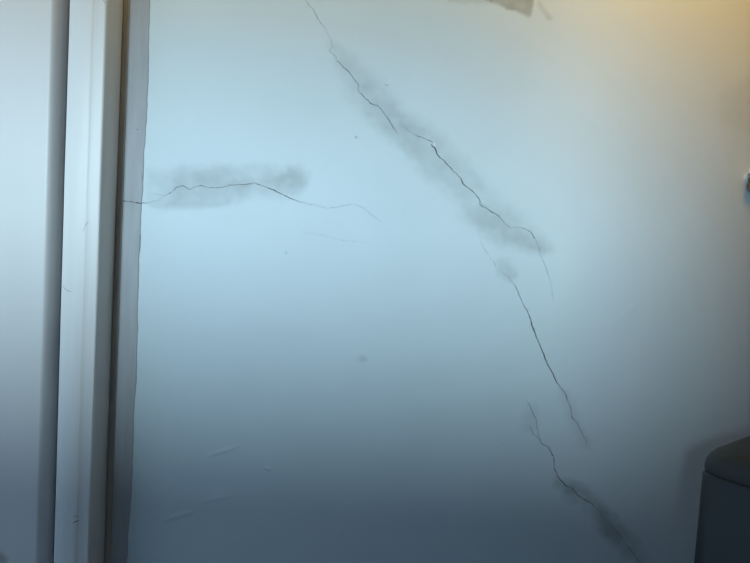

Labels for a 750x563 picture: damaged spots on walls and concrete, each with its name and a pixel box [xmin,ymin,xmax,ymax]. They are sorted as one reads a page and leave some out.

crack [418,136,499,216]
crack [515,286,567,398]